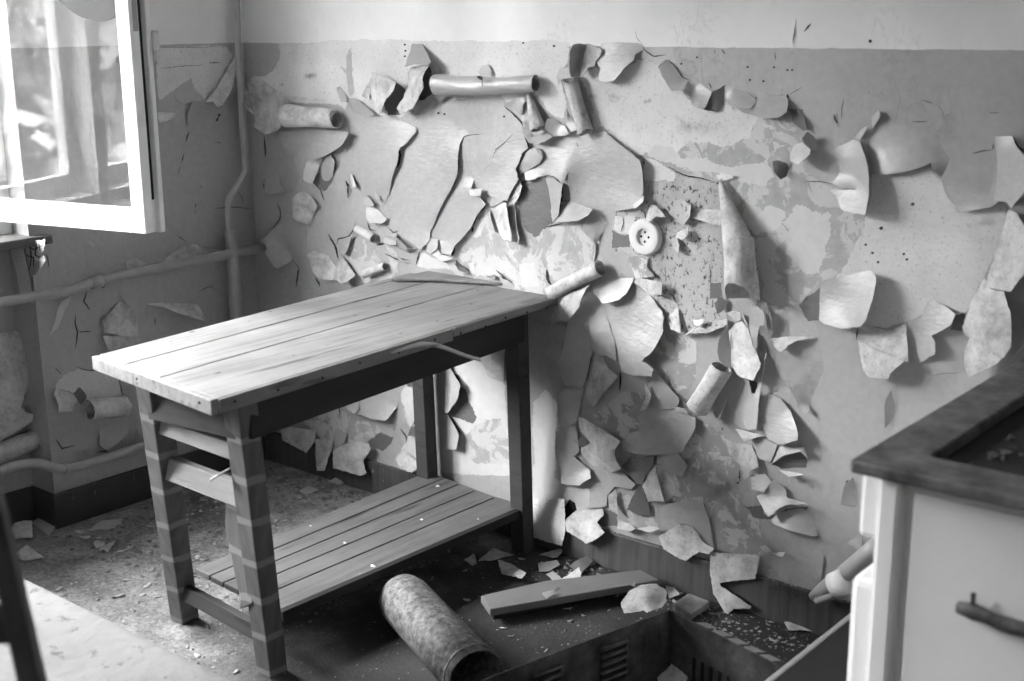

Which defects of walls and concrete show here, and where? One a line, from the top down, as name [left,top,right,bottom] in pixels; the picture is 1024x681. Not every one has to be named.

crack [55,291,96,373]
peeling [103,286,206,350]
peeling [156,39,1024,614]
peeling [54,369,143,453]